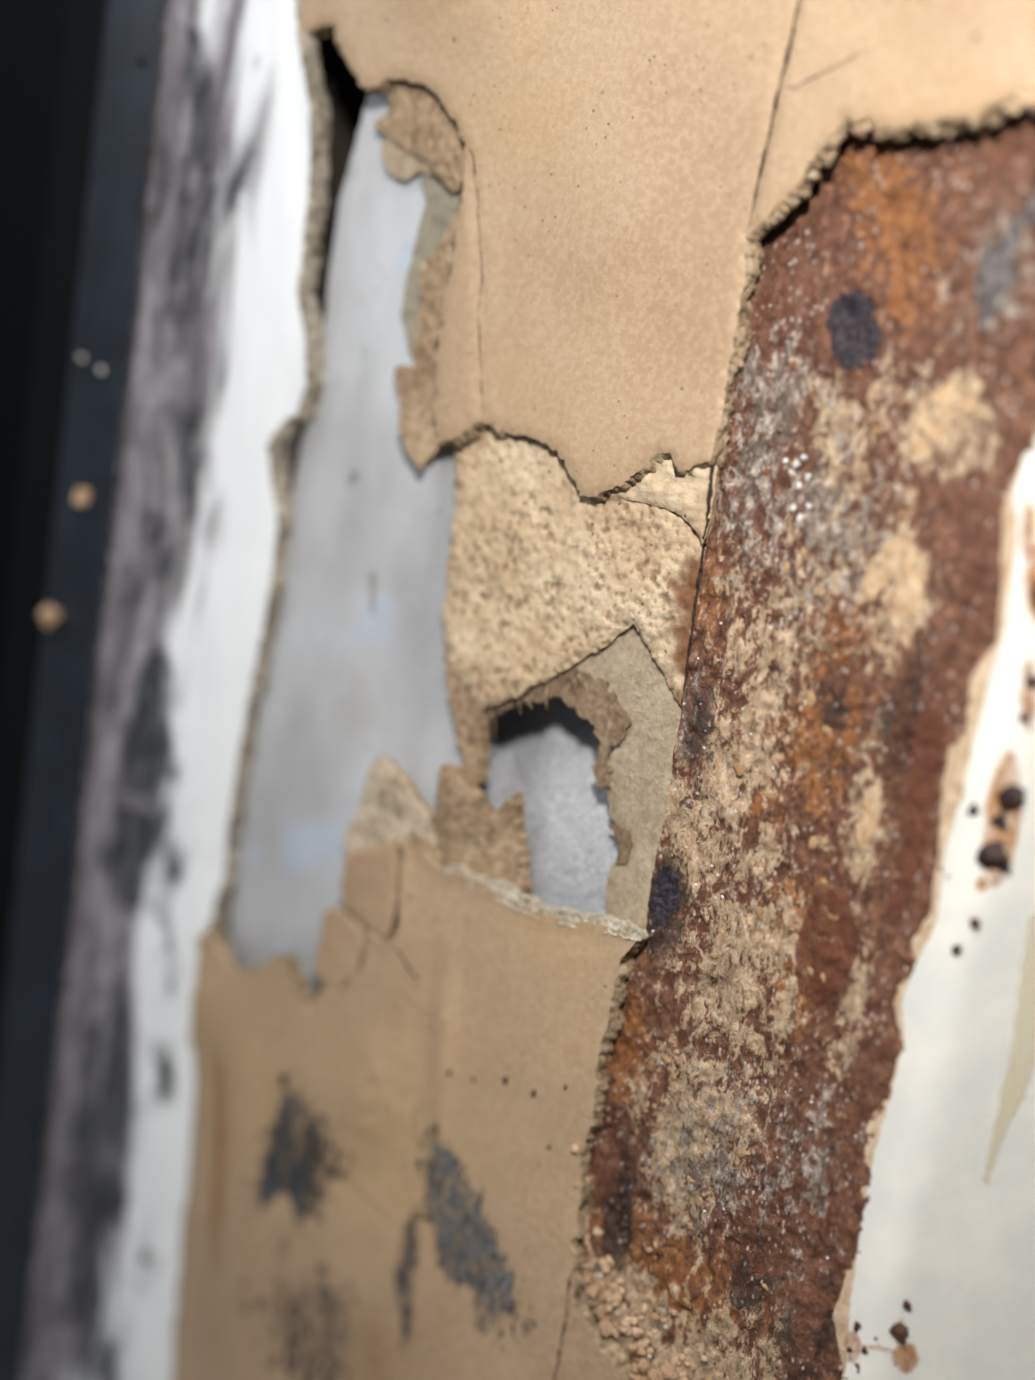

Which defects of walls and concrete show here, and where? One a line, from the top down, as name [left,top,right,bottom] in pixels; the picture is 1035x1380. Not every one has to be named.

crack [749,0,865,227]
crack [469,149,483,417]
flaking render [313,81,720,987]
corrosion [571,95,1035,1380]
water stain [241,1067,354,1233]
water stain [396,1118,536,1348]